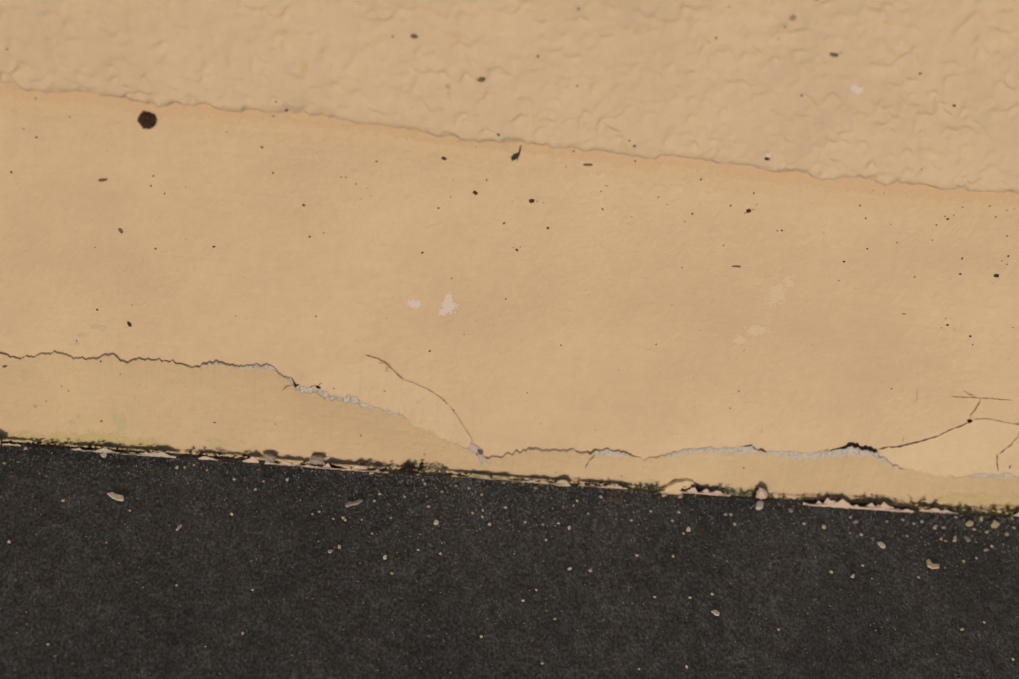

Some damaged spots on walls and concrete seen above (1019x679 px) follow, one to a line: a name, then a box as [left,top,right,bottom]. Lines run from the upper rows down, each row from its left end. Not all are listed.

spalling [197,362,406,419]
peeling [451,442,631,489]
crack [365,355,759,469]
spalling [655,446,901,470]
crack [878,391,1019,470]